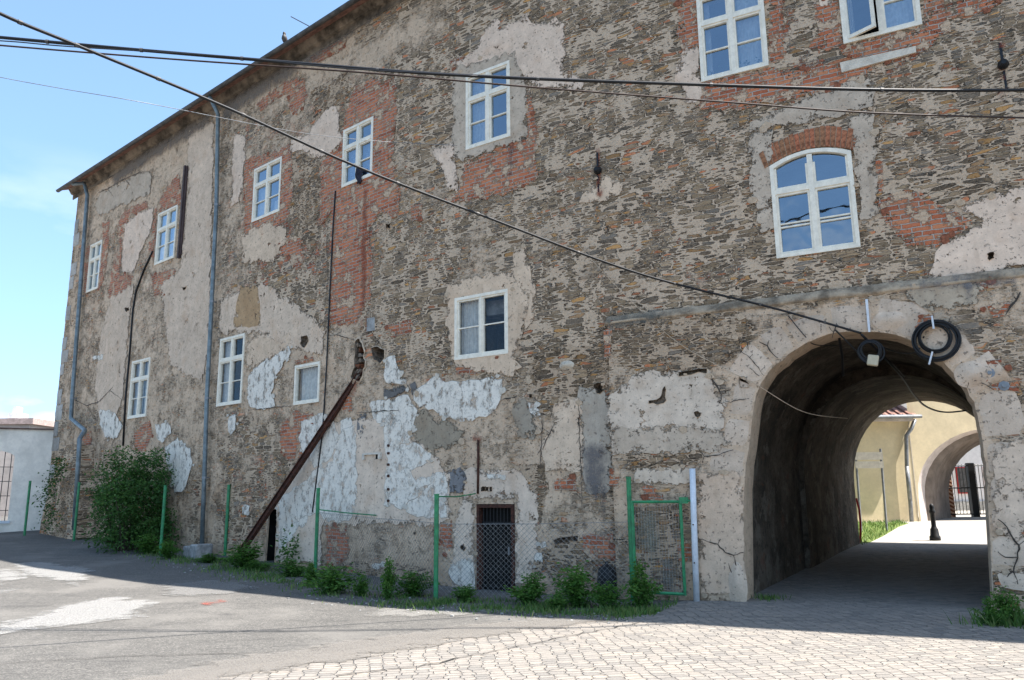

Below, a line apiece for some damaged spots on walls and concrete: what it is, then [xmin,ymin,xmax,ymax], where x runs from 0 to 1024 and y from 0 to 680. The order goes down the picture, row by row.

flaking render [673,0,1024,329]
flaking render [82,72,755,598]
crack [701,539,744,572]
crack [998,519,1024,584]